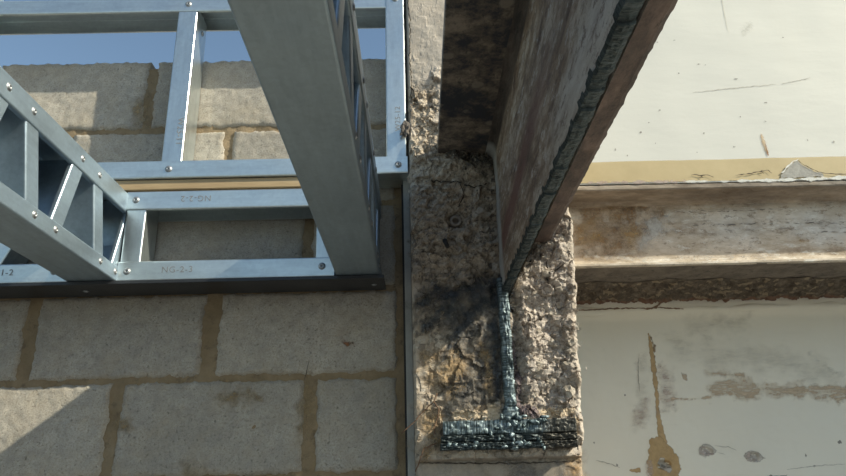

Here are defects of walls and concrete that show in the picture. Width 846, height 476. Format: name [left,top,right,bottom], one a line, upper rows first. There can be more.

peeling [721,159,846,183]
spalling [515,221,580,435]
damp [702,373,846,402]
spalling [452,400,502,421]